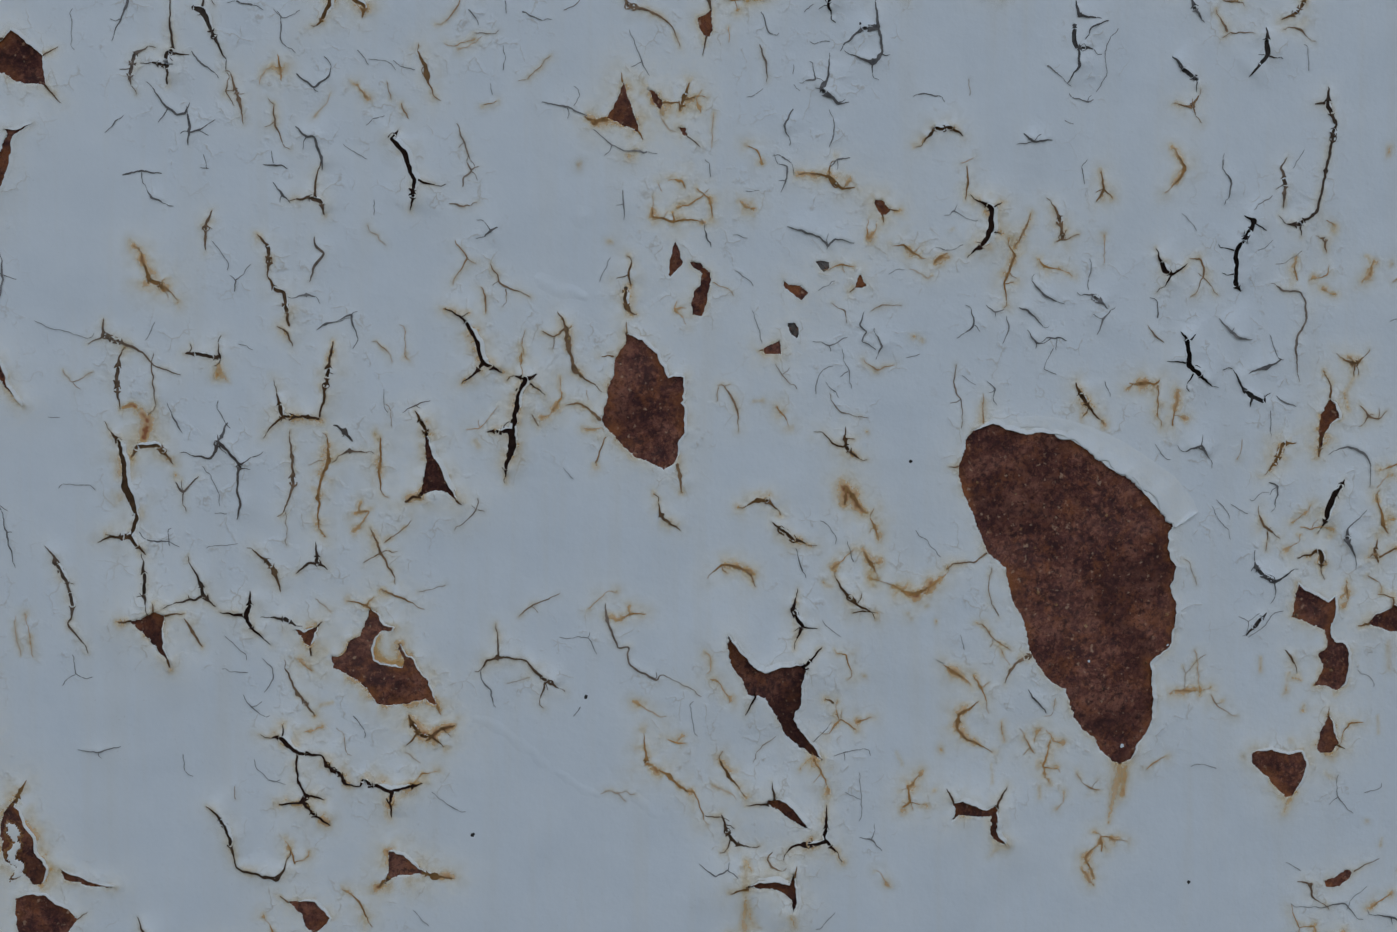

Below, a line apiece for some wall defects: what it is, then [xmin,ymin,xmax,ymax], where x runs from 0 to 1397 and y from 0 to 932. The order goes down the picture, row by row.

crack [0,255,14,296]
crack [35,0,890,882]
peeling [567,322,689,493]
crack [475,0,1397,887]
crack [0,506,16,568]
peeling [332,597,441,715]
peeling [725,632,825,762]
peeling [946,416,1198,764]
peeling [1292,582,1352,690]
peeling [0,780,117,932]
crack [342,889,372,927]
crack [1288,863,1397,932]